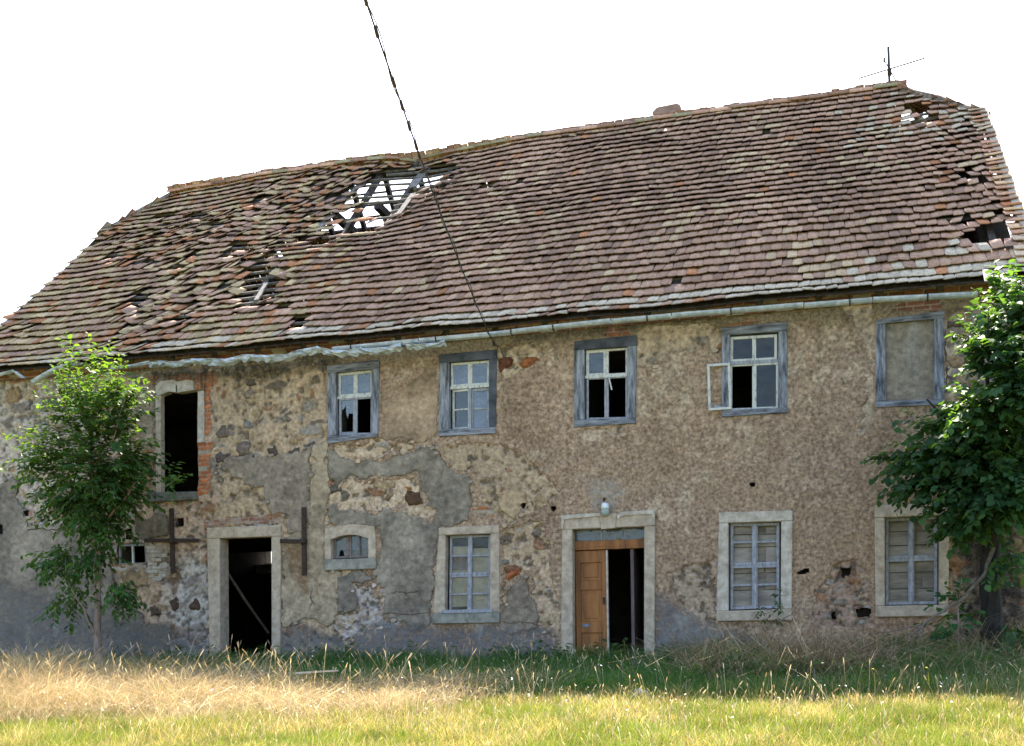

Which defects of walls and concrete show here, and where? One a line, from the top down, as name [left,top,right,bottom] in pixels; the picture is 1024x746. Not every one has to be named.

spalling [497,342,552,378]
spalling [0,358,435,663]
spalling [434,443,561,638]
spalling [806,560,874,629]